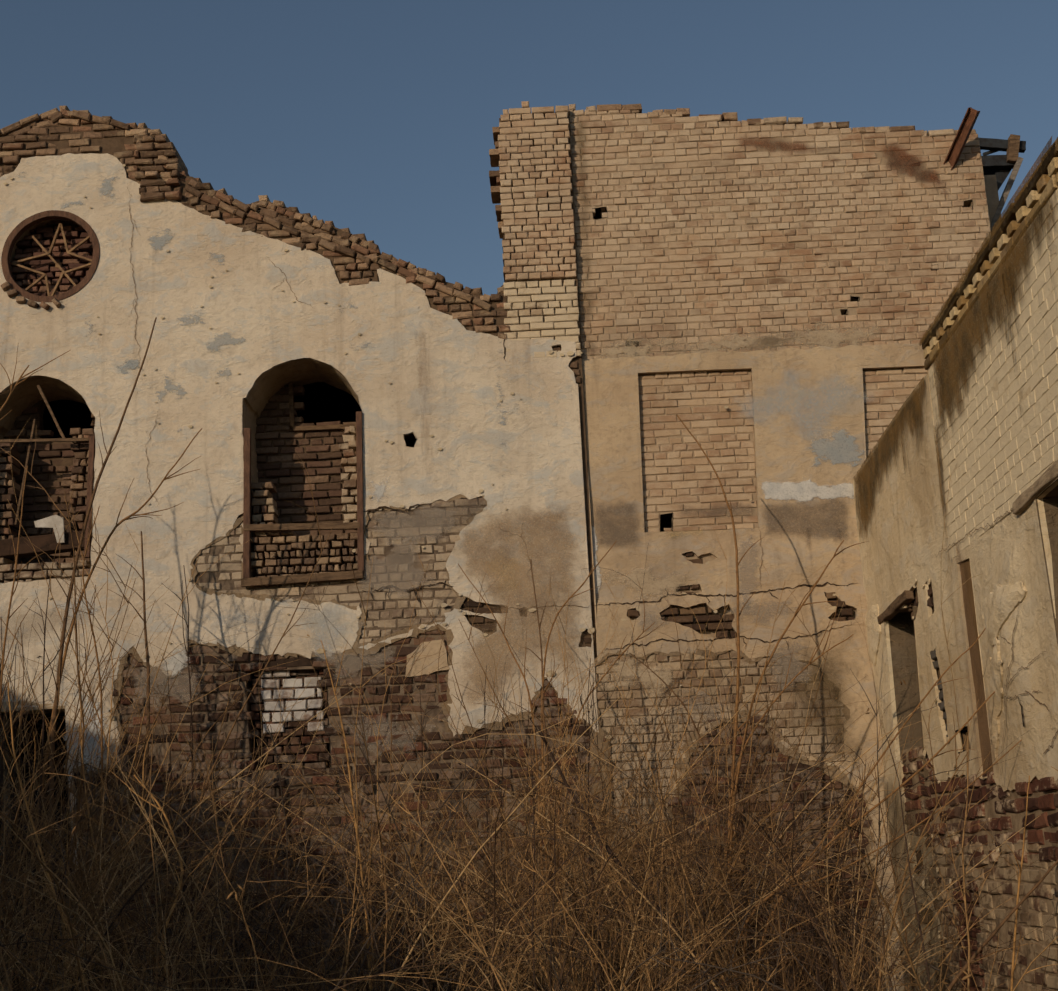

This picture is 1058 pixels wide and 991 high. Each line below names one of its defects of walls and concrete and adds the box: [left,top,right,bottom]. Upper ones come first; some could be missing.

leakage [919,136,1052,346]
leakage [767,190,1056,537]
peeling [762,477,854,502]
peeling [49,597,97,617]
leakage [466,515,573,694]
crack [508,531,856,721]
crack [1000,602,1058,779]
flaking render [896,650,1058,991]